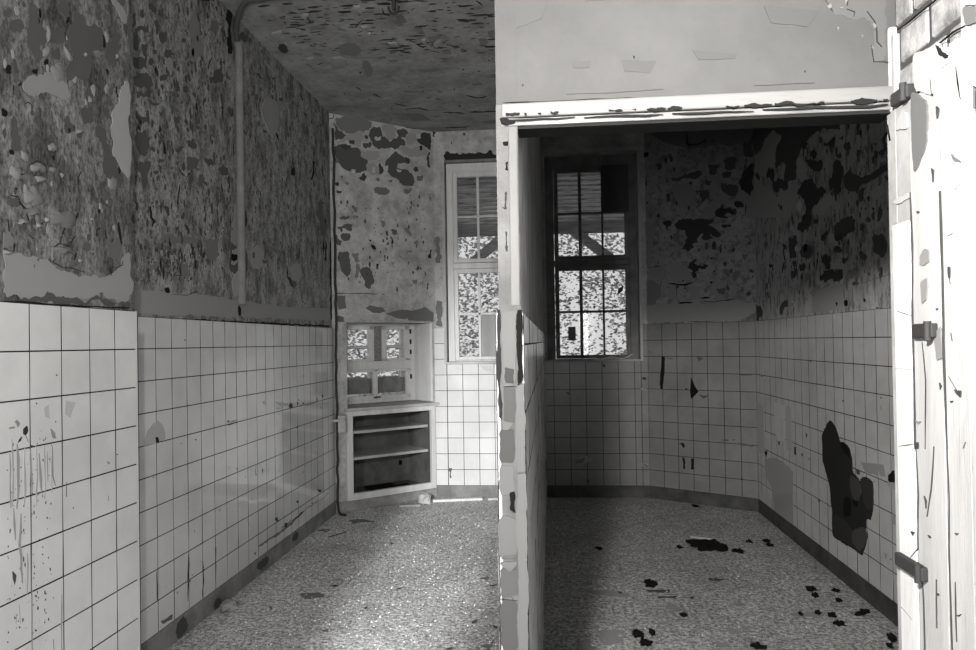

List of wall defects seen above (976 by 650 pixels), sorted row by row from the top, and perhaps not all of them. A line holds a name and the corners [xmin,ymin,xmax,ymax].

peeling [280,0,495,61]
crack [826,0,937,63]
peeling [2,0,442,290]
peeling [496,310,514,419]